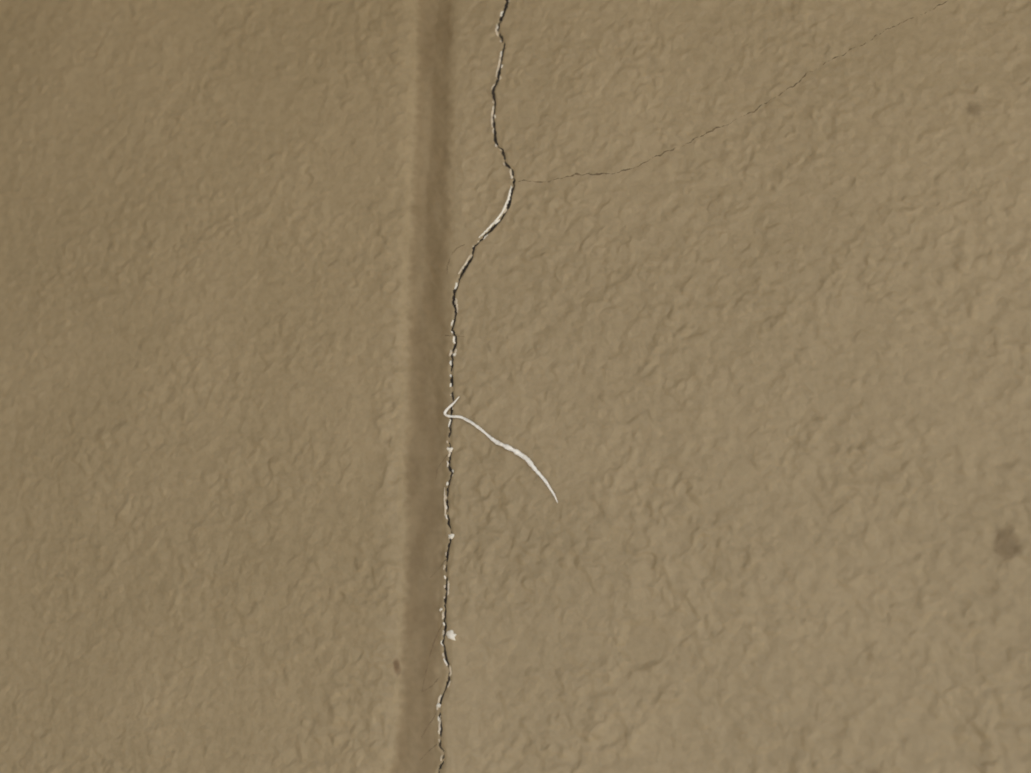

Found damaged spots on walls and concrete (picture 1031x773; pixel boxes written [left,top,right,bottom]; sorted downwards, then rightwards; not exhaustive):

crack [420,0,947,770]